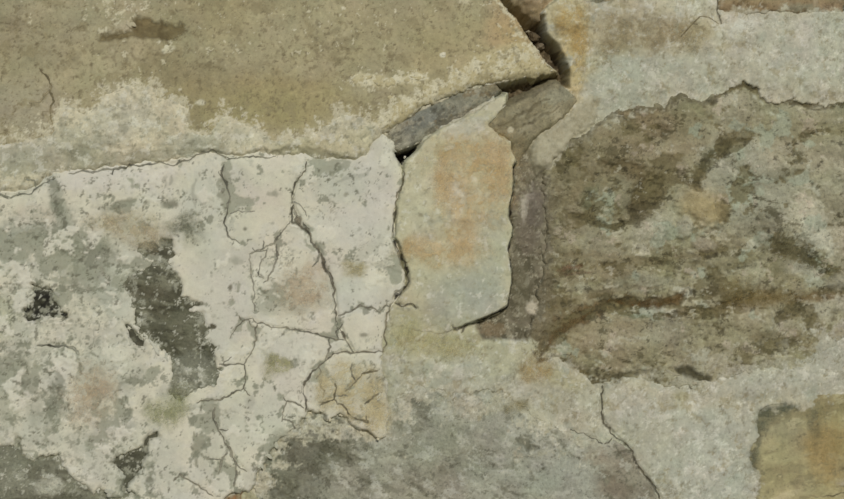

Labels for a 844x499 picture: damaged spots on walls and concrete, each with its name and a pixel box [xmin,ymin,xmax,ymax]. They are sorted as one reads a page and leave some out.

crack [684,0,722,33]
spalling [24,284,68,323]
spalling [122,238,224,401]
crack [0,149,417,486]
crack [452,161,517,332]
spalling [0,433,158,499]
crack [174,473,213,496]
crack [571,385,660,499]